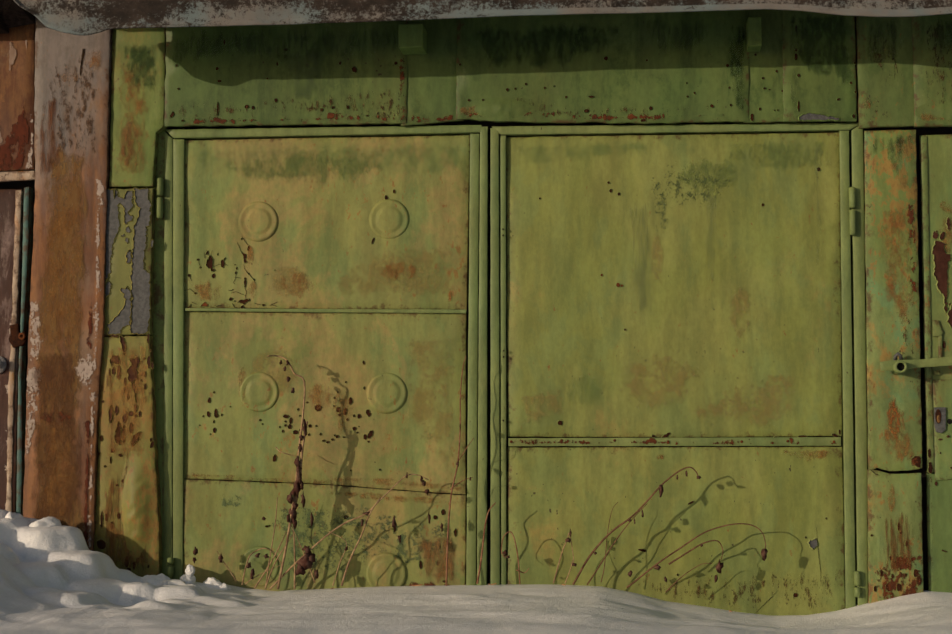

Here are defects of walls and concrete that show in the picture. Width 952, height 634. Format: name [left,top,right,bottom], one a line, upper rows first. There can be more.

corrosion [0,57,99,546]
peeling [74,179,155,467]
corrosion [885,204,917,355]
corrosion [877,491,932,600]